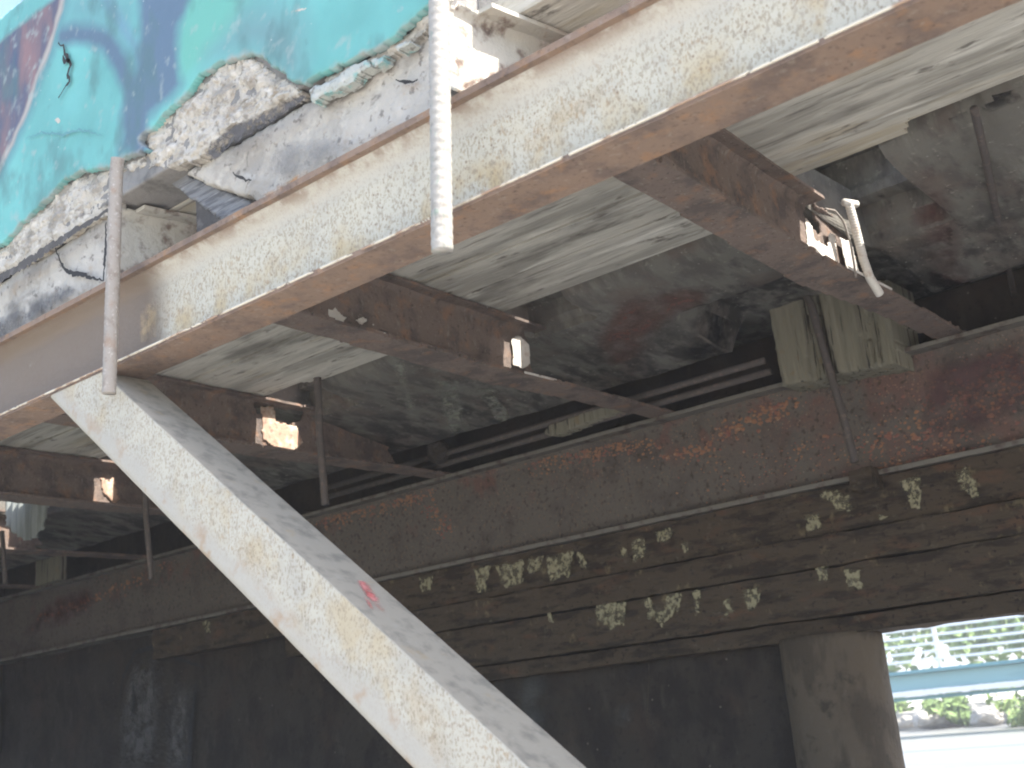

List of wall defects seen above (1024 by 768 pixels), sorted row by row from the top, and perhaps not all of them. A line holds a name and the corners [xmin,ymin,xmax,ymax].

spalling [124,15,429,172]
crack [0,208,108,283]
spalling [0,171,109,285]
peeling [805,218,865,277]
peeling [328,307,374,325]
peeling [511,336,557,380]
peeling [261,406,303,450]
rust [515,345,1024,496]
peeling [100,478,120,503]